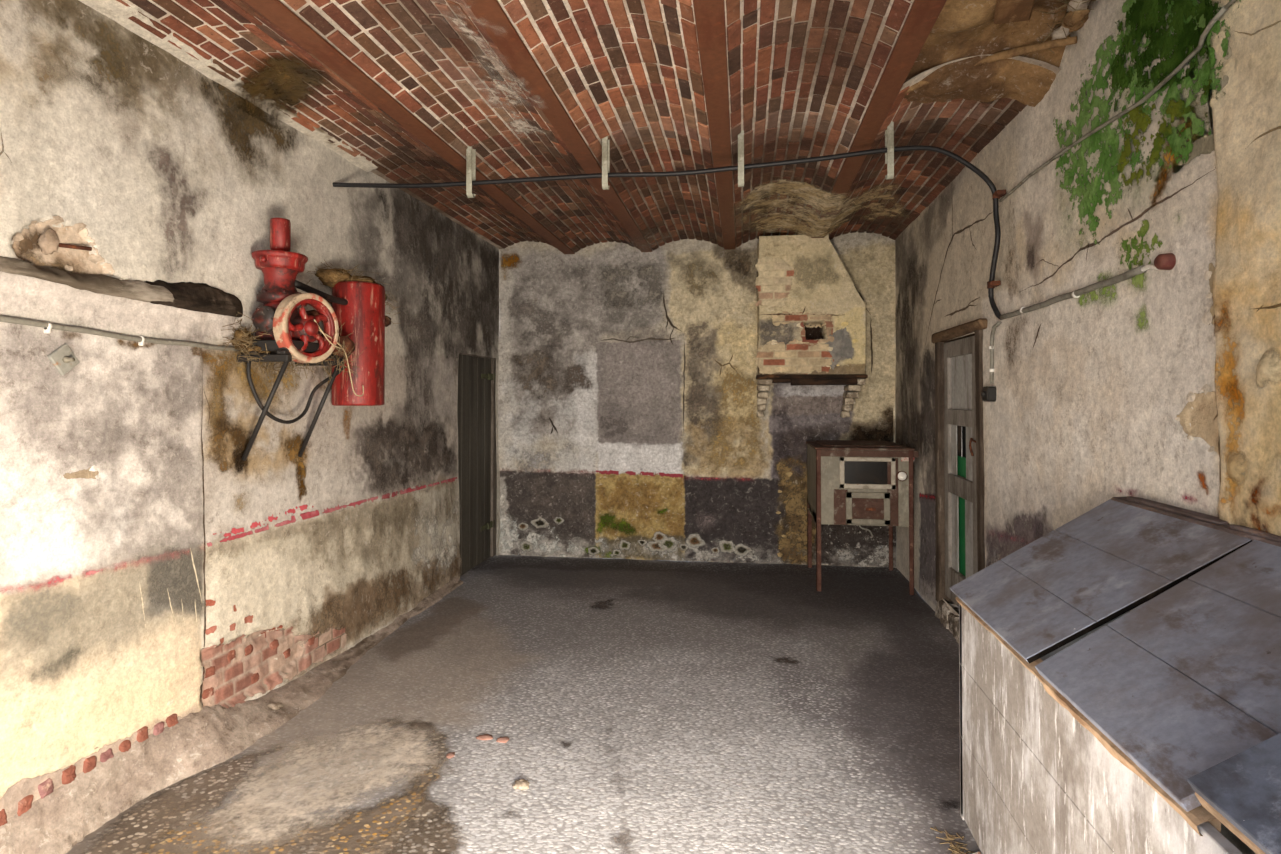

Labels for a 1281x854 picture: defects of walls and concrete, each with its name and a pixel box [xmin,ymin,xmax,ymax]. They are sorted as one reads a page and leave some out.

leakage [201,77,296,166]
leakage [296,461,307,500]
leakage [363,188,592,535]
flaking render [755,257,858,374]
crack [923,205,1000,353]
crack [1020,169,1215,292]
peeling [1175,384,1220,455]
crack [1213,410,1221,518]
crack [1255,303,1281,311]
flaking render [200,605,347,708]
flaking render [0,698,185,826]
leakage [83,719,462,854]